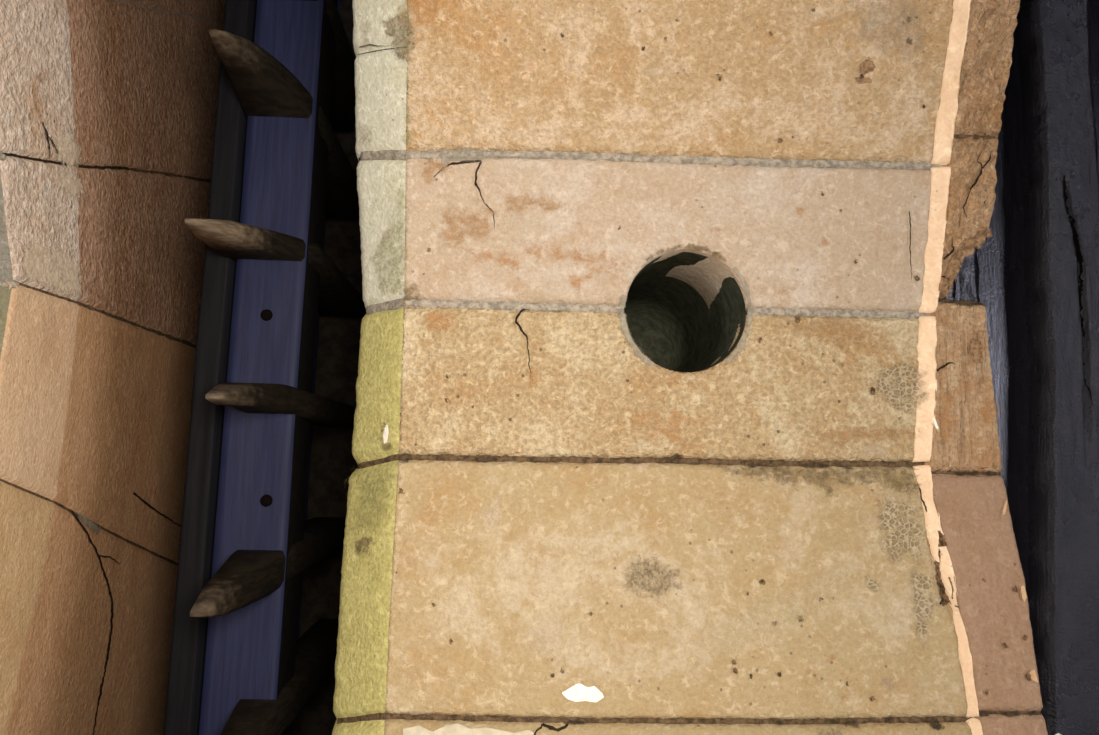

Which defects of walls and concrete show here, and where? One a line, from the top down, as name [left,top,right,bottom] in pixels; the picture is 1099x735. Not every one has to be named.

crack [3,122,129,170]
crack [434,160,495,228]
crack [515,309,531,372]
crack [71,511,120,735]
flaking render [403,723,534,735]